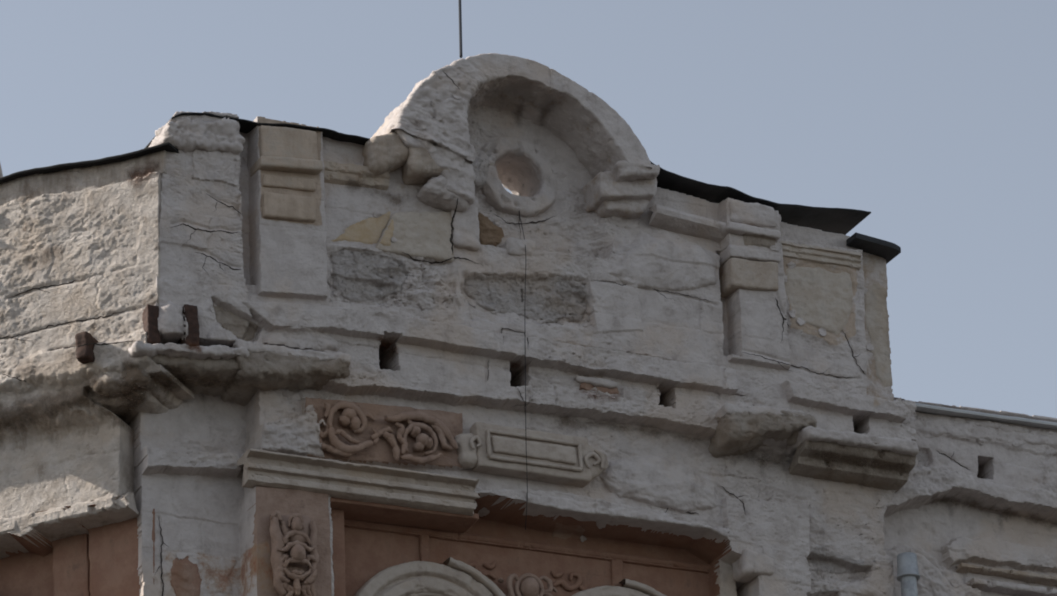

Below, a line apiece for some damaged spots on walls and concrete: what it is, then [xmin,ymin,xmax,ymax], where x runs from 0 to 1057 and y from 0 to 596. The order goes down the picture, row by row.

spalling [328,211,413,304]
crack [9,280,81,298]
spalling [463,268,595,324]
crack [0,308,133,350]
leakage [0,363,219,429]